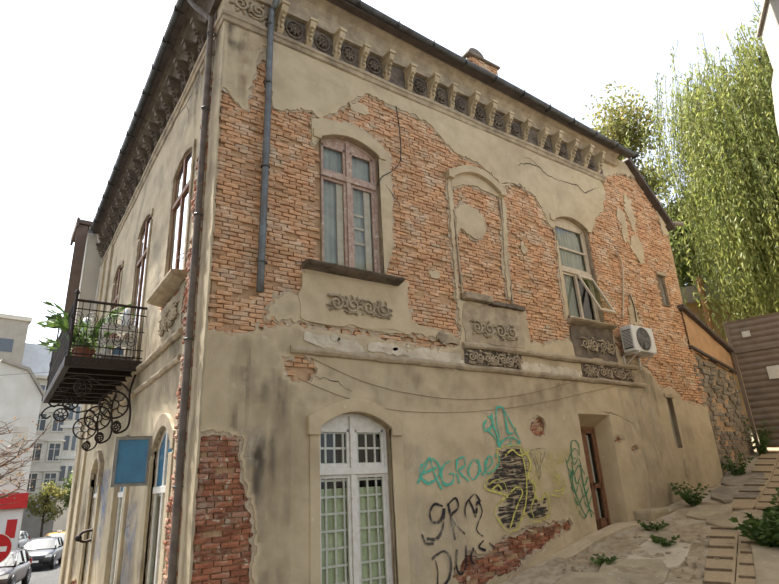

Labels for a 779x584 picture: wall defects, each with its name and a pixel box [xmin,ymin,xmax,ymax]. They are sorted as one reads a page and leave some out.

crack [501,158,599,193]
flaking render [299,95,580,371]
flaking render [161,54,320,584]
flaking render [588,175,706,406]
peeling [521,361,582,377]
flaking render [530,417,544,436]
flaking render [453,520,571,584]